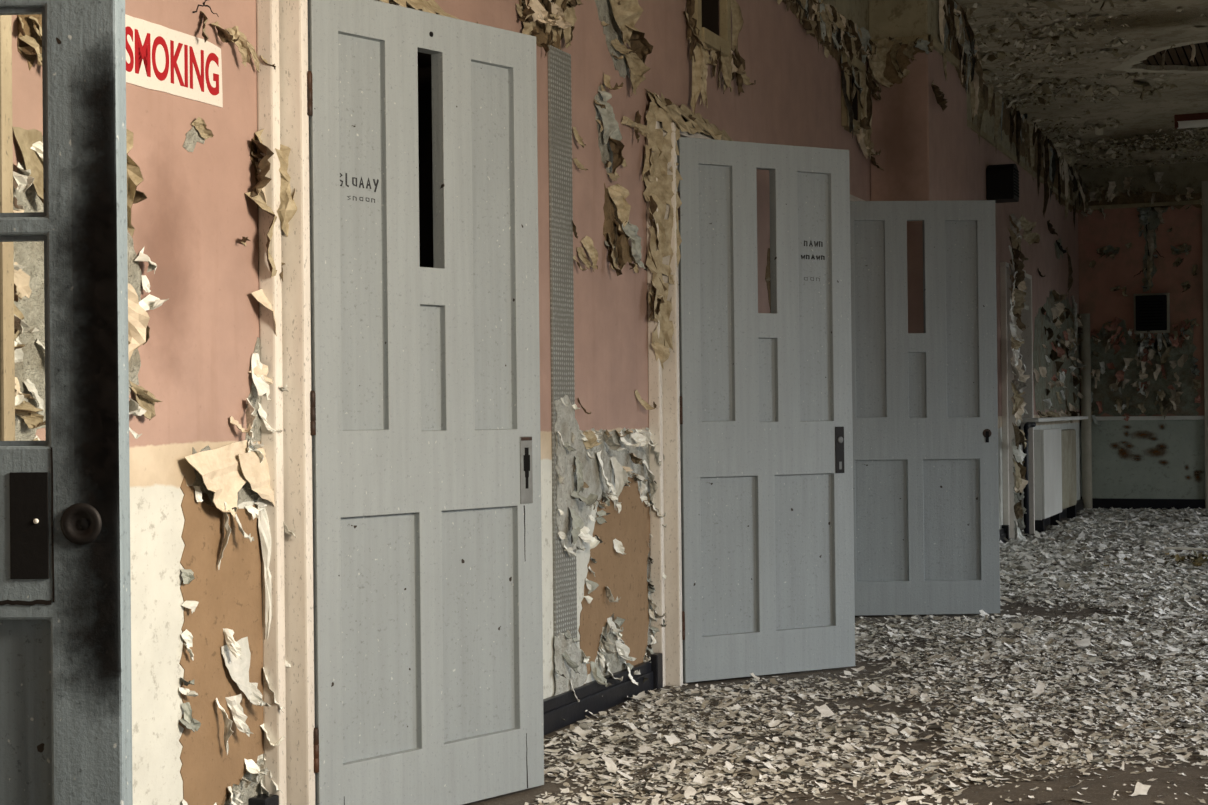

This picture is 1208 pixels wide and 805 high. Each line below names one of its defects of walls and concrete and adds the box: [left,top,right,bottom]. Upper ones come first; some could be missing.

flaking render [13,127,44,213]
flaking render [14,241,45,441]
flaking render [126,128,168,439]
peeling [182,117,214,152]
peeling [251,289,277,336]
peeling [245,129,297,281]
peeling [516,0,756,369]
peeling [777,0,1208,542]
peeling [178,337,296,805]
peeling [554,395,667,712]